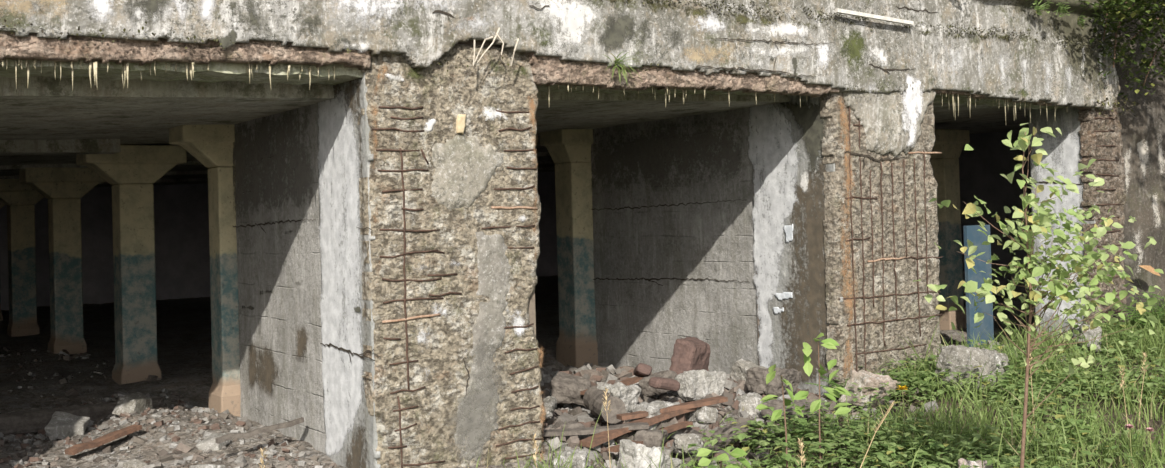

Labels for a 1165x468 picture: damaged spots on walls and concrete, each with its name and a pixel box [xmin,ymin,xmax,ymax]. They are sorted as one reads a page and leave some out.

water stain [91,0,114,21]
water stain [200,0,214,19]
water stain [219,0,260,48]
water stain [338,0,456,21]
water stain [539,0,648,51]
water stain [695,13,725,31]
water stain [747,23,829,80]
water stain [1015,0,1107,89]
spalling [935,90,1128,329]
spalling [0,31,943,468]
water stain [249,342,278,395]
crack [320,343,375,362]